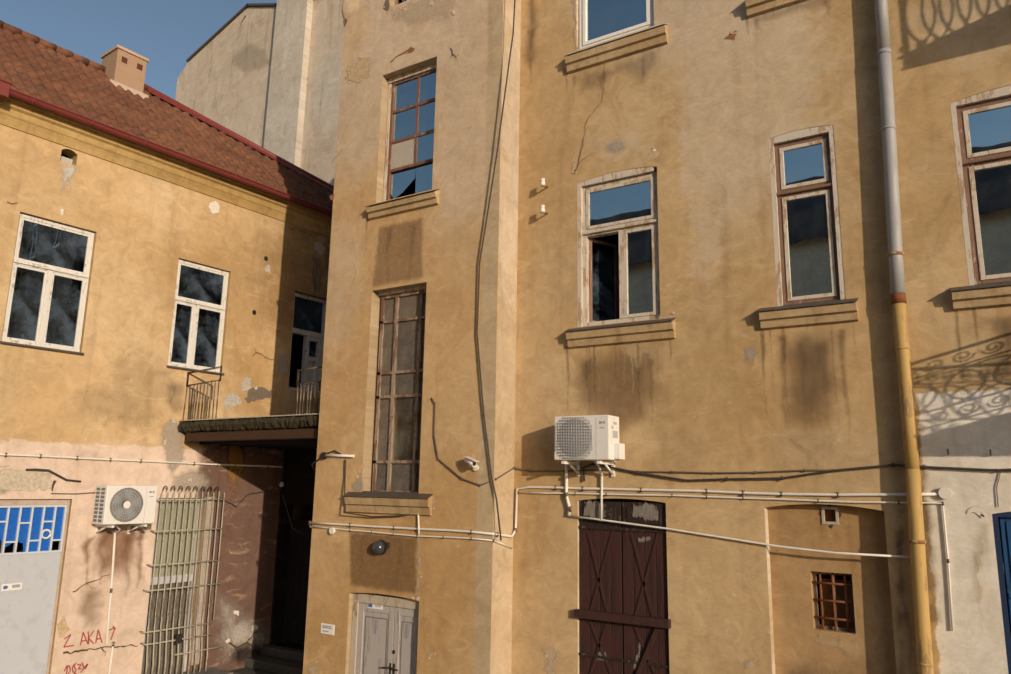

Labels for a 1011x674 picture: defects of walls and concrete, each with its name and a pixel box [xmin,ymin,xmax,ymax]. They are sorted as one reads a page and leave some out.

crack [575,76,604,172]
crack [63,644,137,654]